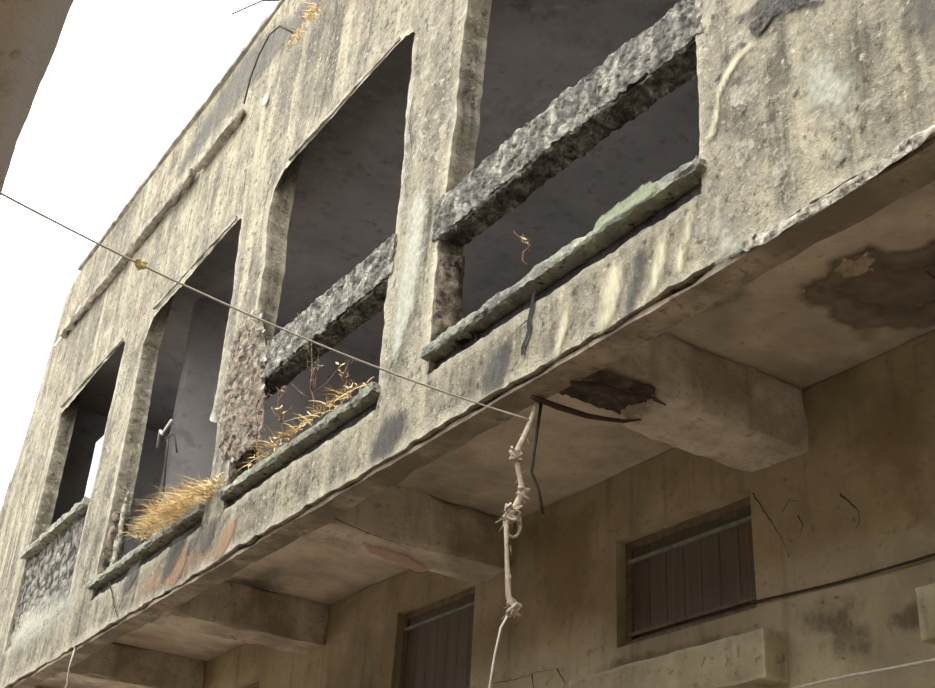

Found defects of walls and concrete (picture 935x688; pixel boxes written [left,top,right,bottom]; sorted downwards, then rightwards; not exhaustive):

spalling [530,370,666,423]
crack [752,493,804,555]
crack [840,493,860,529]
crack [494,668,565,688]